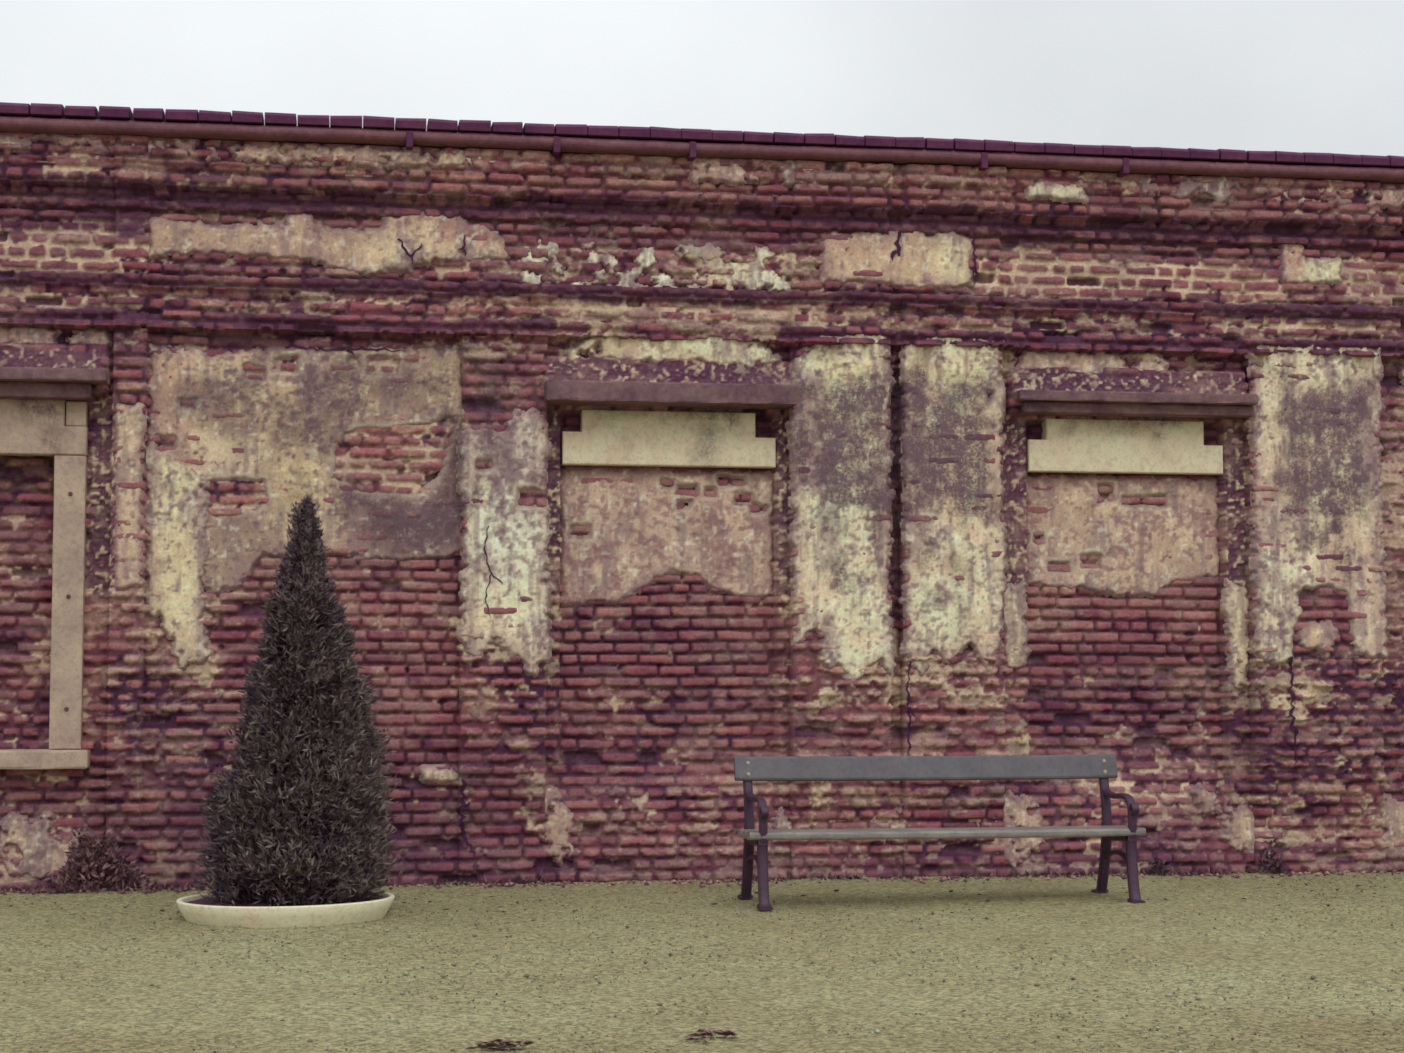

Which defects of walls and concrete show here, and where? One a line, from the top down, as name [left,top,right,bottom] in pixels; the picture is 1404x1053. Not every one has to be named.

peeling [148,211,975,293]
crack [890,231,902,260]
peeling [113,323,1404,691]
crack [483,526,503,615]